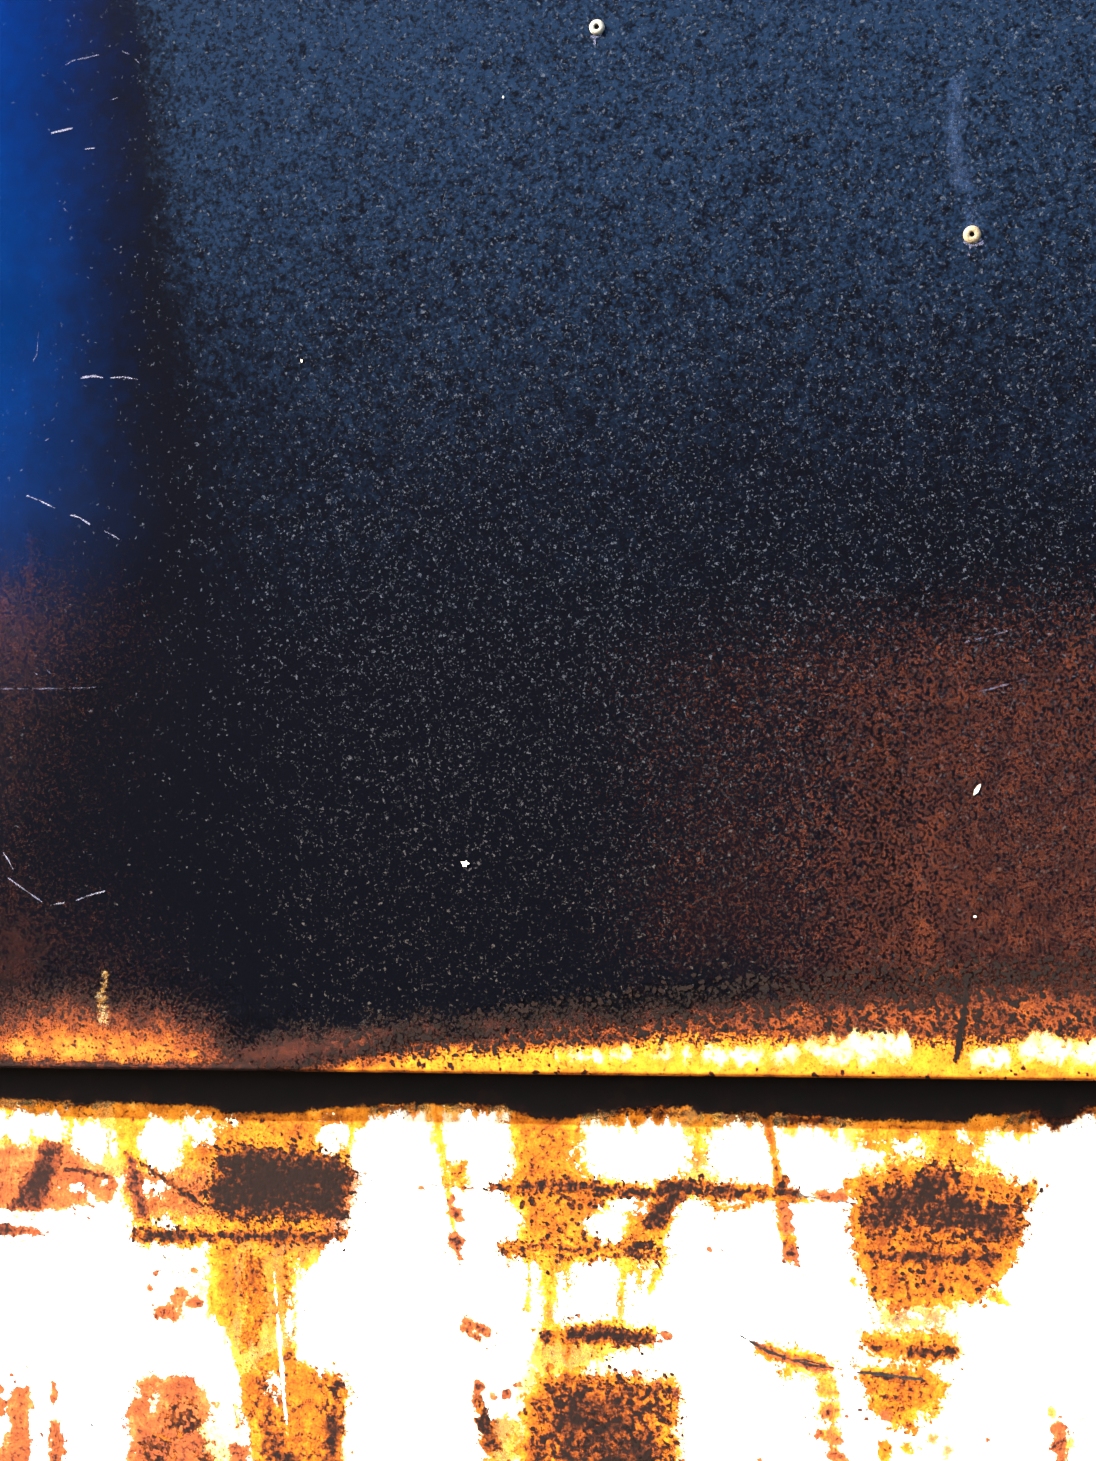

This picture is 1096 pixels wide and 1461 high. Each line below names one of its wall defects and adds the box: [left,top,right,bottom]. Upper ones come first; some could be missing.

rust [0,932,1096,1461]